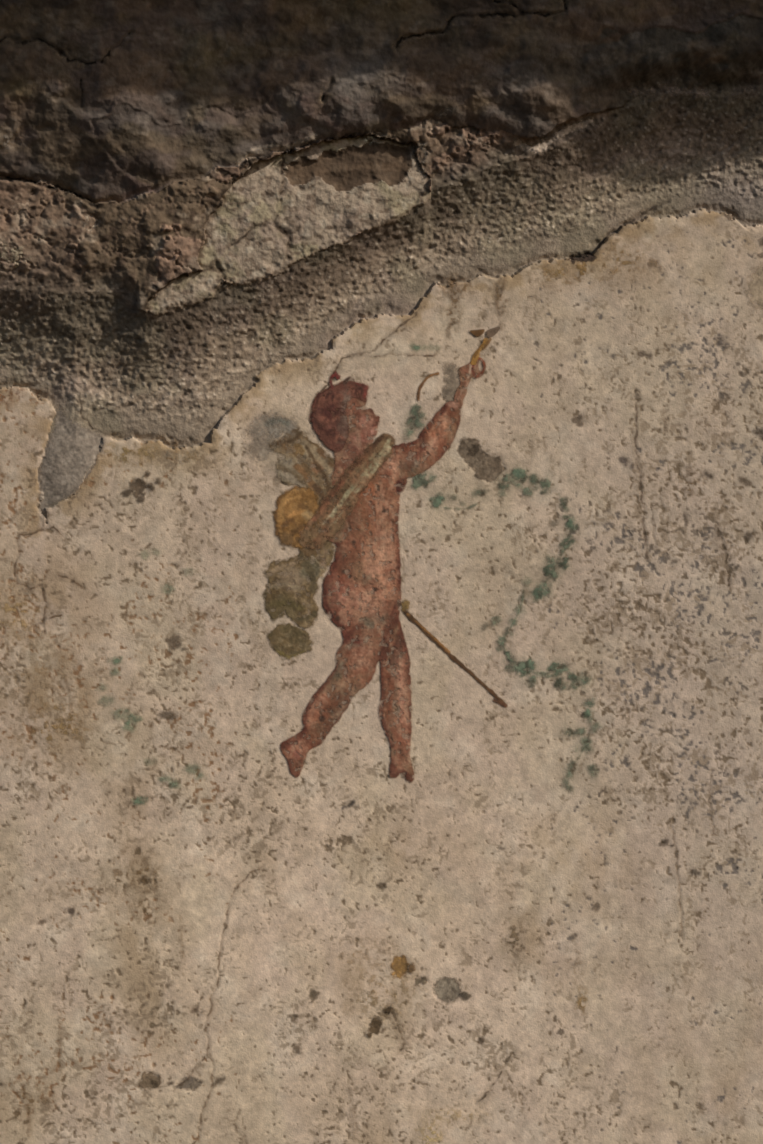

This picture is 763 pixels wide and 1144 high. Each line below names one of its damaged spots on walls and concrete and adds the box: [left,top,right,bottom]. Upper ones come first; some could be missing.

crack [395,0,567,48]
crack [0,32,132,92]
spalling [570,251,596,263]
spalling [443,363,460,402]
spalling [246,414,288,460]
spalling [458,438,503,482]
spalling [124,472,160,502]
crack [179,869,260,1144]